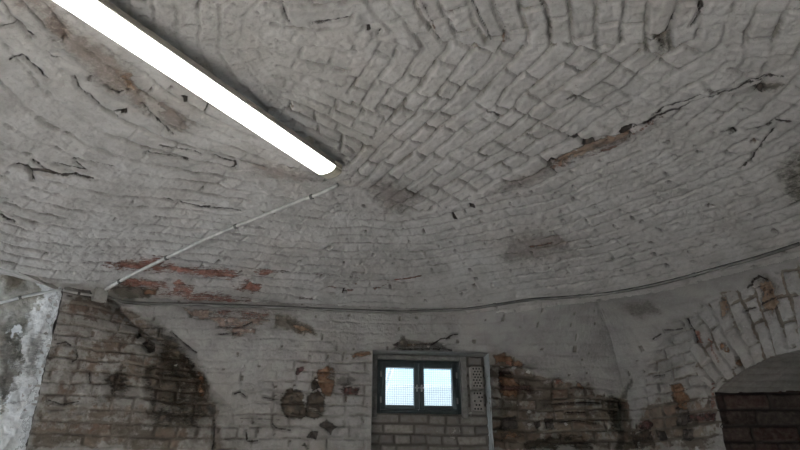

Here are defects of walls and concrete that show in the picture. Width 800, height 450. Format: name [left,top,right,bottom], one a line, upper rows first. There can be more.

crack [9,53,53,76]
crack [16,157,113,180]
crack [148,144,237,167]
spalling [548,105,670,169]
crack [743,118,790,166]
water stain [4,275,22,289]
peeling [103,255,289,337]
water stain [0,318,39,401]
peeling [280,366,360,449]
peeling [497,367,599,450]